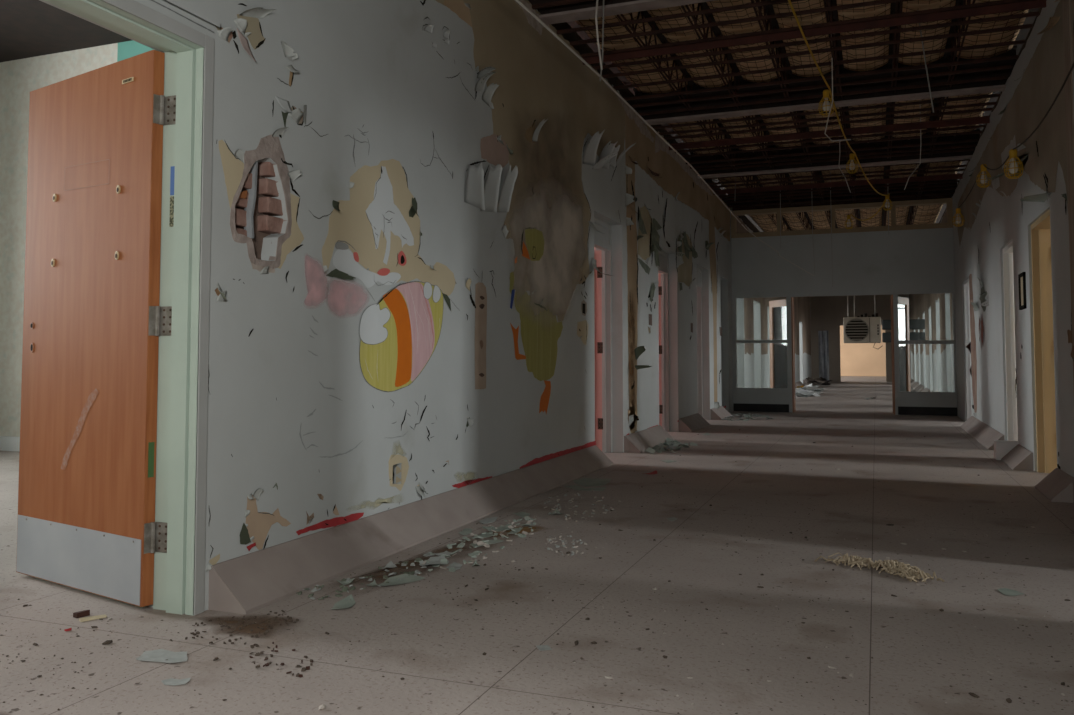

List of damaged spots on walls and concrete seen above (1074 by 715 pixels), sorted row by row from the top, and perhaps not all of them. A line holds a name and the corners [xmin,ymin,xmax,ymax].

peeling [215,3,277,62]
peeling [215,279,244,302]
spalling [216,96,328,274]
peeling [312,159,457,296]
flaking render [420,0,750,434]
flaking render [744,296,811,355]
flaking render [909,293,953,356]
flaking render [966,274,989,418]
flaking render [941,0,1074,245]
peeling [240,488,291,551]